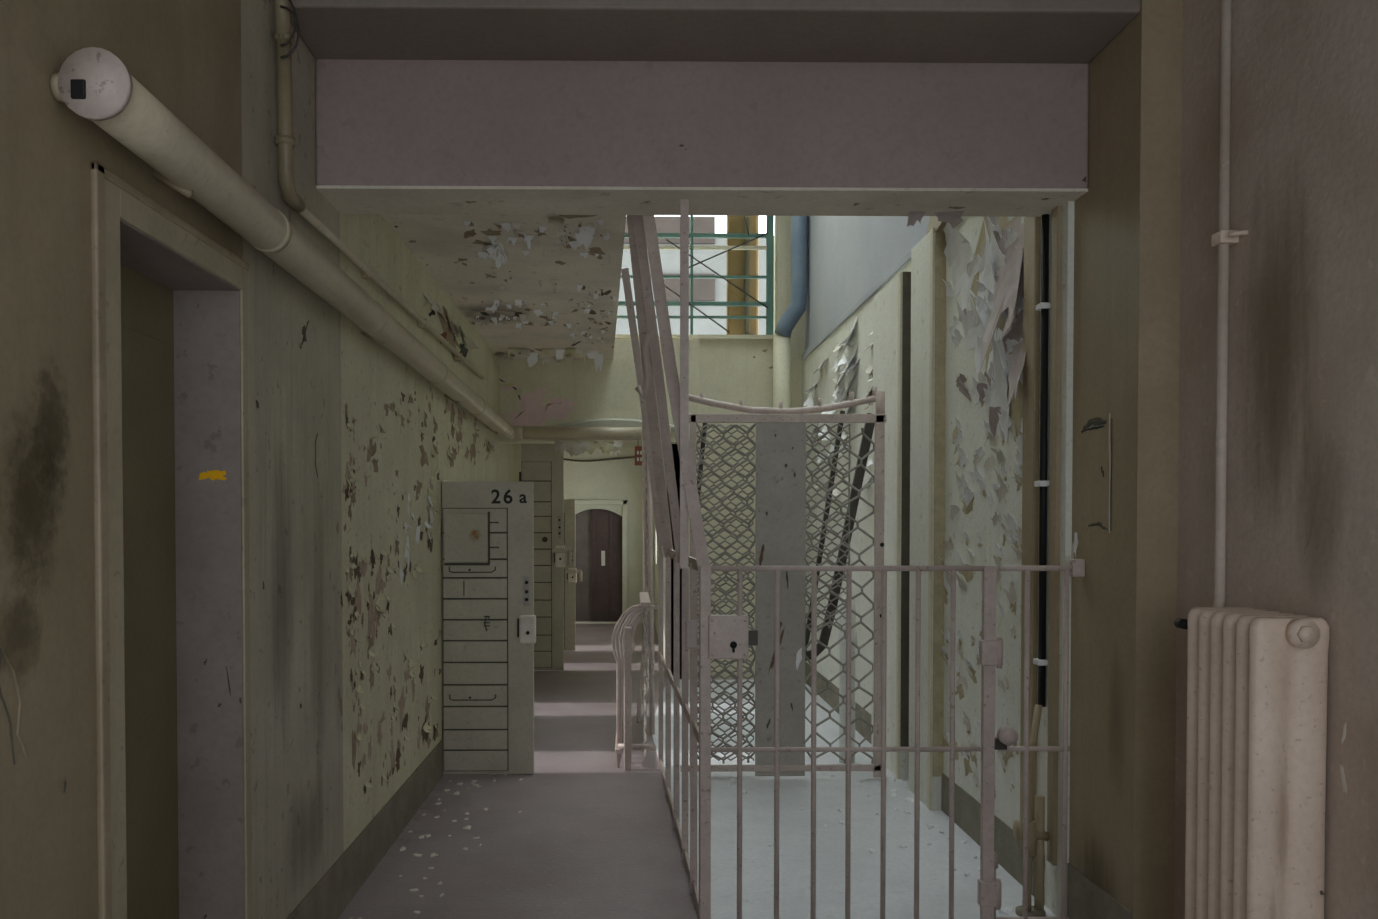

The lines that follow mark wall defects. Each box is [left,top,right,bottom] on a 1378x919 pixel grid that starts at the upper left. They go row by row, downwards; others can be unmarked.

peeling [423,284,617,373]
peeling [457,215,611,283]
peeling [906,206,1026,639]
peeling [336,381,495,795]
peeling [941,620,1019,800]